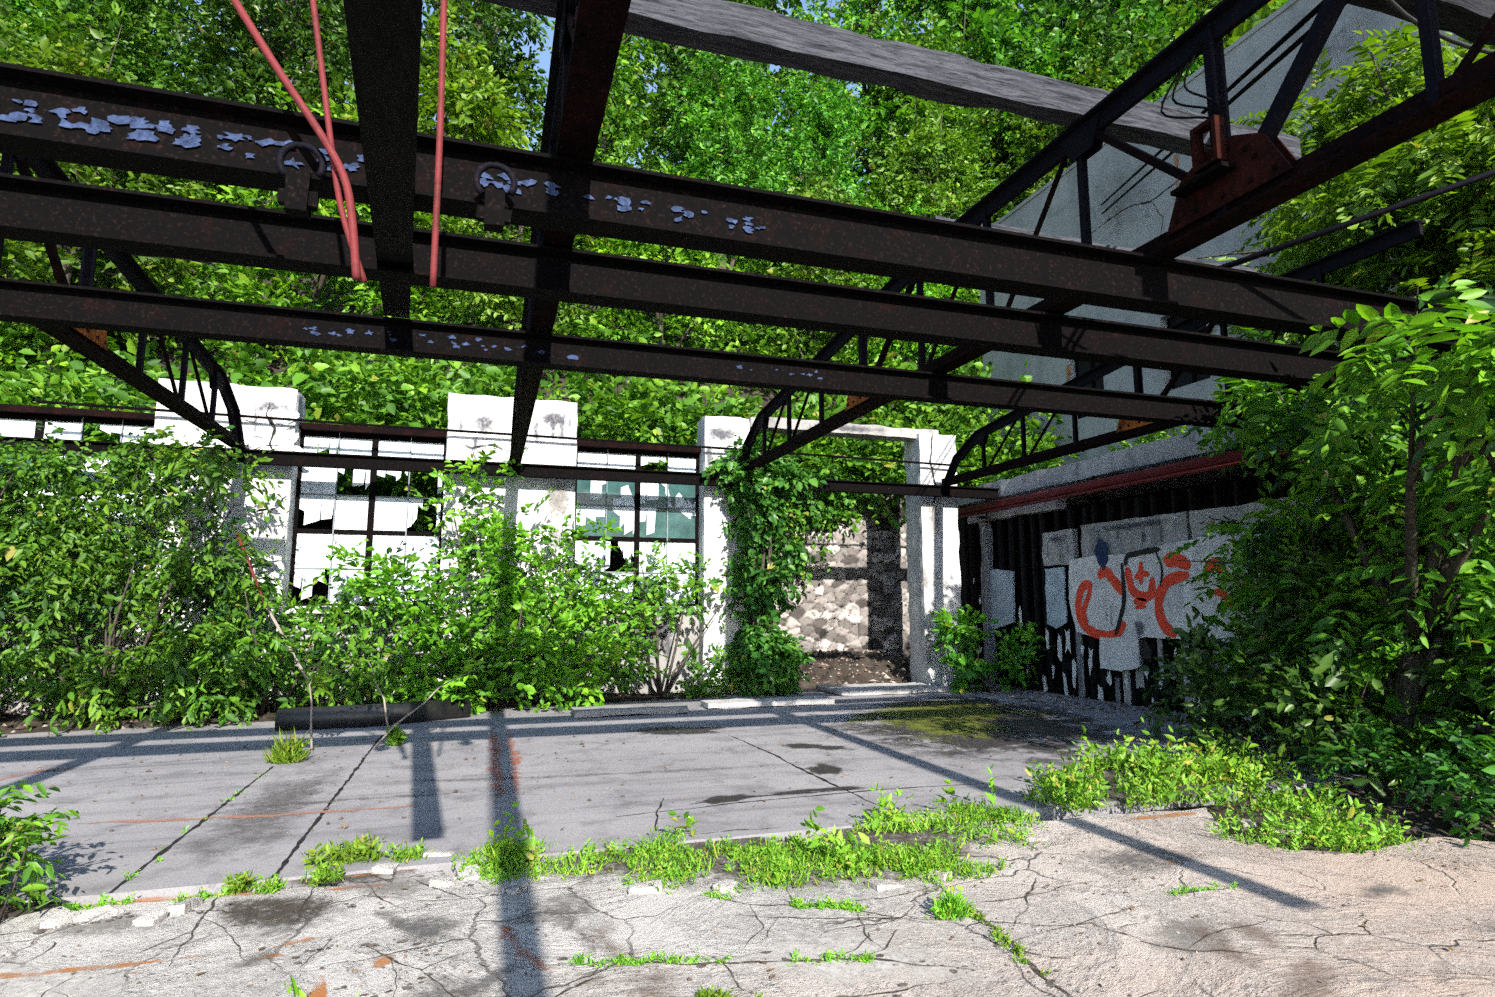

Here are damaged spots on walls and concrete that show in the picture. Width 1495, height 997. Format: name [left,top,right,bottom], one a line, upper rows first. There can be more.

peeling [0,99,364,171]
peeling [480,172,560,196]
peeling [582,195,651,211]
peeling [671,206,708,222]
peeling [726,216,766,233]
water stain [774,696,1133,795]
water stain [704,794,756,804]
crack [300,869,464,911]
crack [138,888,247,962]
crack [555,877,1268,997]
crack [0,928,70,997]
crack [369,947,481,997]